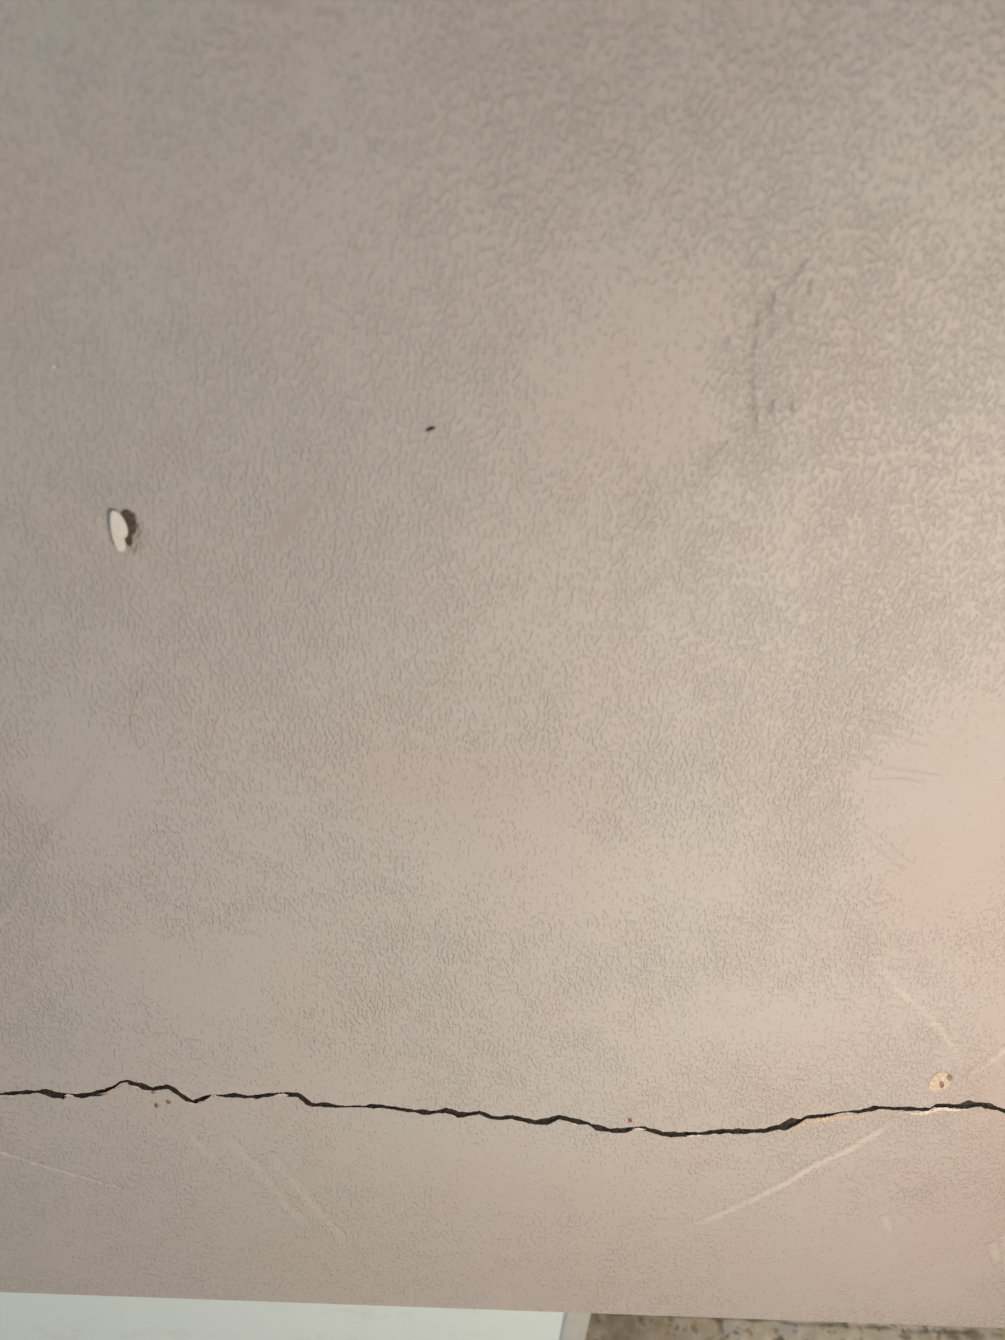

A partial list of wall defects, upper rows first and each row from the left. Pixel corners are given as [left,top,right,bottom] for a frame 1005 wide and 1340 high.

crack [0,1080,1005,1137]